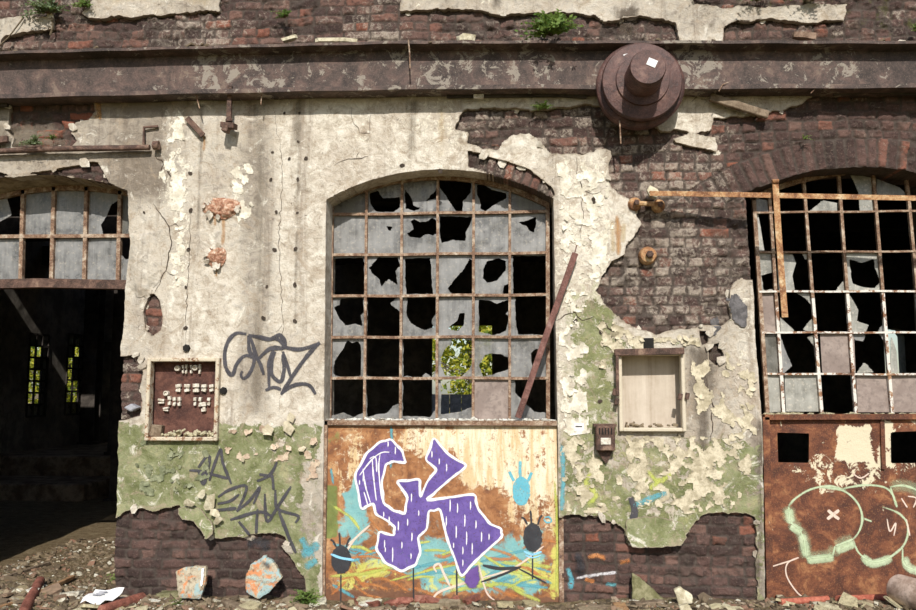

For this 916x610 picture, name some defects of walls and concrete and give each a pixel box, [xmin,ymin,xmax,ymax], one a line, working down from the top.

flaking render [0,0,678,51]
flaking render [693,0,916,41]
flaking render [37,158,119,190]
crack [154,205,191,321]
flaking render [143,292,163,335]
flaking render [456,96,916,602]
peeling [228,412,320,481]
flaking render [114,447,306,598]